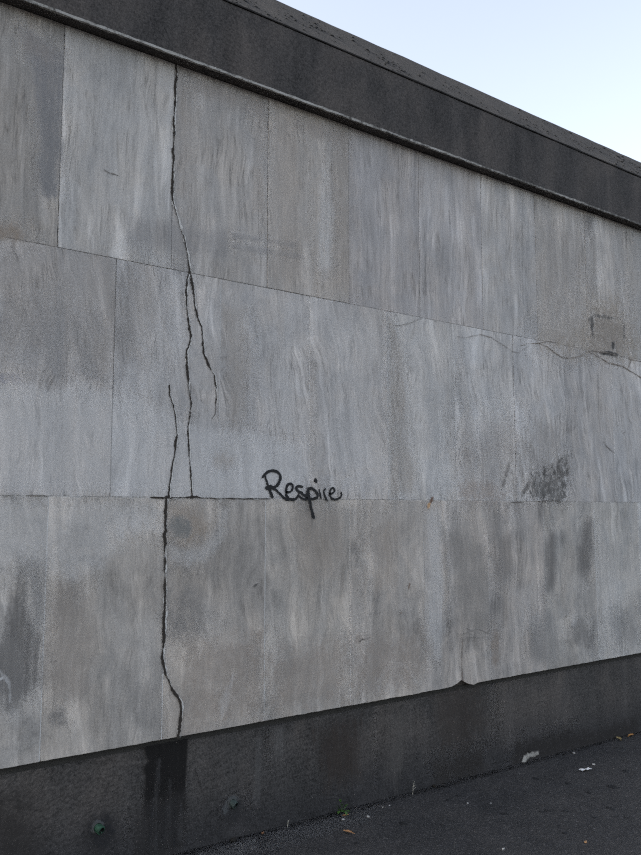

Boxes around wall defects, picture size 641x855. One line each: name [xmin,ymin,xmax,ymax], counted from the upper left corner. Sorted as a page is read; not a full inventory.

crack [150,63,268,739]
crack [459,334,641,378]
leakage [136,739,188,855]